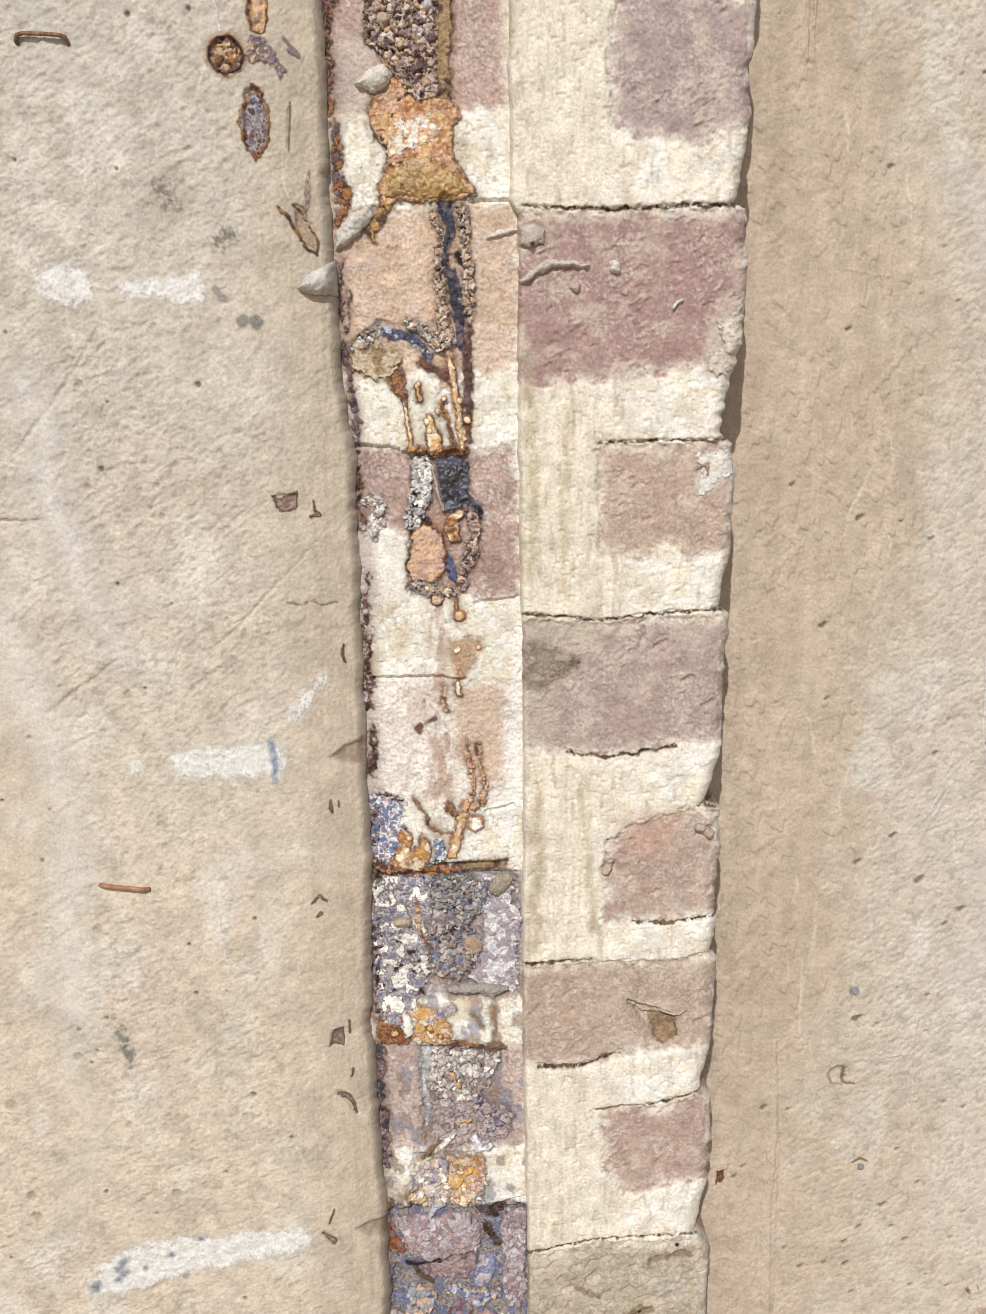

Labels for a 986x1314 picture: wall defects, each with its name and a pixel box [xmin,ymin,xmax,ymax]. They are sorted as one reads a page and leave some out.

rust [205,0,300,78]
spalling [362,0,453,100]
rust [236,83,270,161]
rust [322,0,353,226]
rust [365,75,478,243]
spalling [348,316,456,380]
crack [0,516,50,524]
peeling [360,491,387,541]
spalling [403,453,484,598]
spalling [371,871,522,1027]
spalling [389,1043,528,1314]